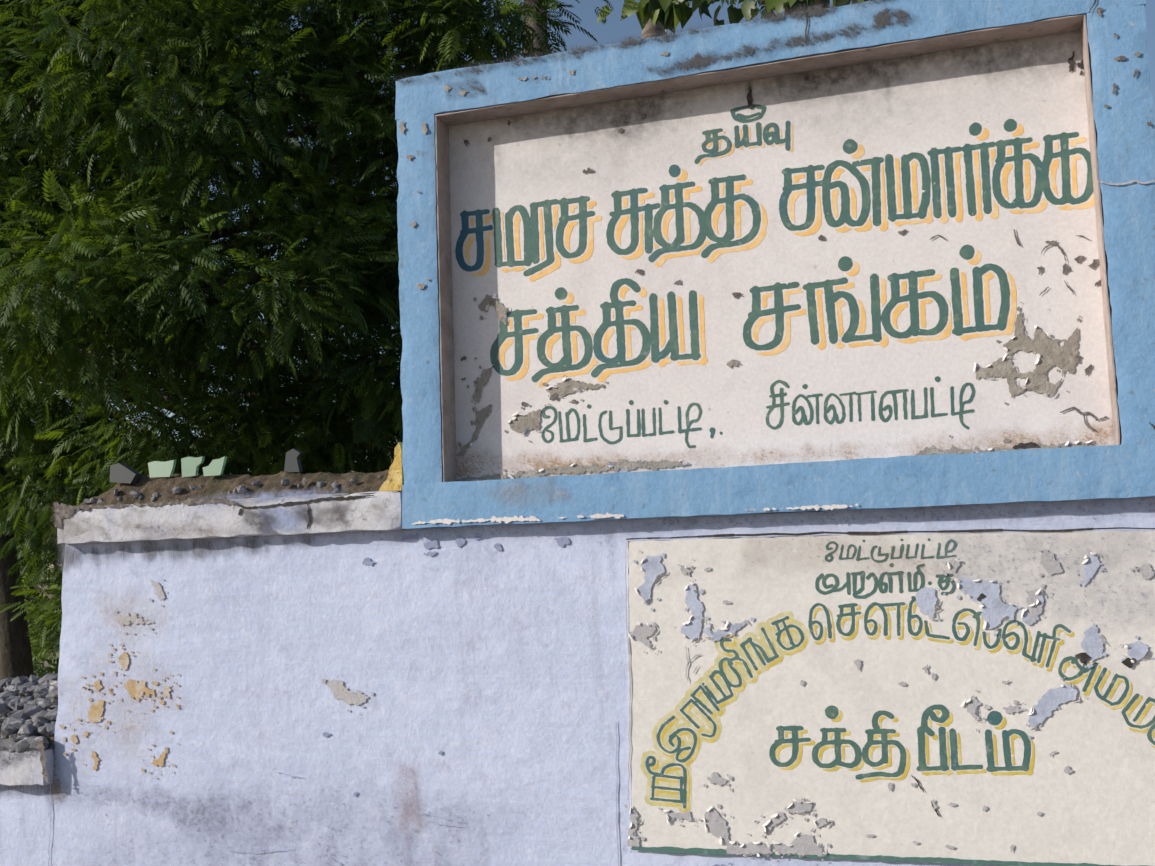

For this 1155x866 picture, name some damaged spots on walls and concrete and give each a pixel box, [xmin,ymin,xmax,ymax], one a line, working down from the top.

peeling [473,293,509,325]
peeling [973,302,1092,405]
peeling [457,356,494,457]
peeling [504,375,607,442]
crack [237,495,374,529]
peeling [628,550,754,654]
peeling [907,549,1105,636]
peeling [1075,616,1155,668]
peeling [59,611,179,779]
peeling [322,679,374,715]
peeling [961,677,1086,739]
peeling [658,798,833,866]